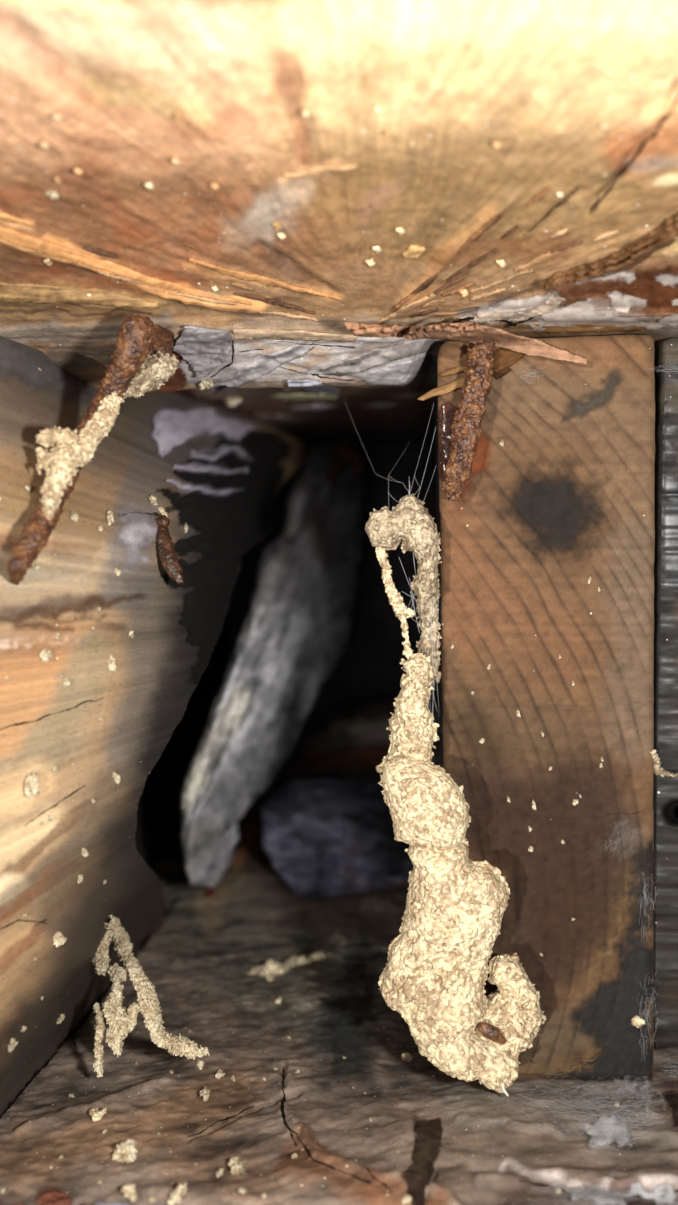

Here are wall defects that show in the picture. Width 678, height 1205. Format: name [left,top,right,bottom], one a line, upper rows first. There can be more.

corrosion [156,346,196,400]
corrosion [438,401,459,482]
water stain [507,473,602,552]
crack [0,697,104,730]